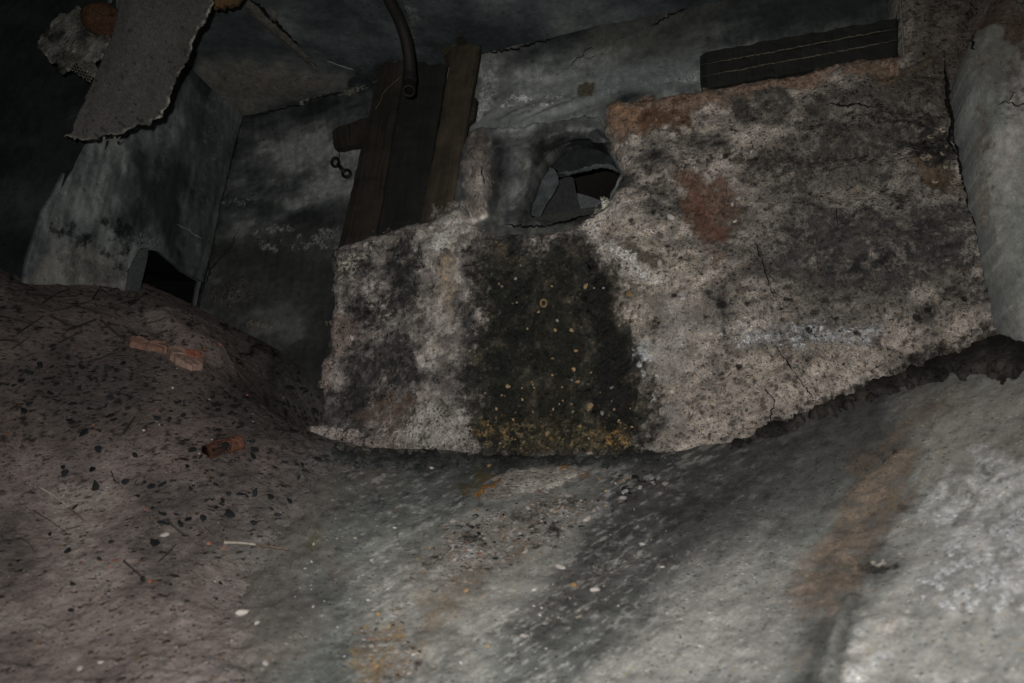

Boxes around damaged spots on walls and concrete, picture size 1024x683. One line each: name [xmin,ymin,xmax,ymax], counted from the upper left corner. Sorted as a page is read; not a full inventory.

leakage [253,198,885,458]
corrosion [672,169,743,266]
crack [771,338,816,399]
crack [907,53,988,292]